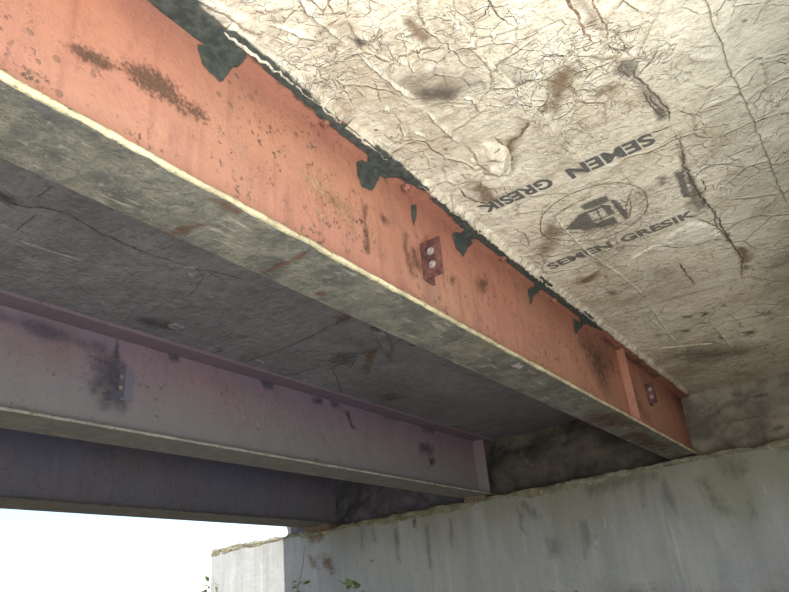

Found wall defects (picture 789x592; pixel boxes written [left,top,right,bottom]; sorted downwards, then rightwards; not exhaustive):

crack [478,0,513,26]
rust [70,44,208,124]
crack [458,187,526,205]
crack [495,88,551,162]
crack [566,0,789,321]
crack [3,187,243,295]